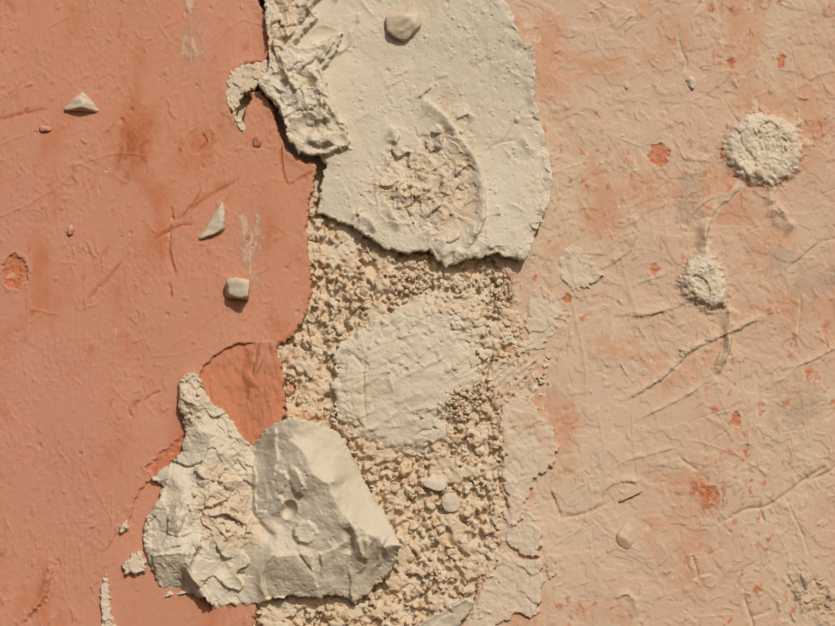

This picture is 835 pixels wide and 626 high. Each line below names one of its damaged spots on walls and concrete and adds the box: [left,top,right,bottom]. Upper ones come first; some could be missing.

spalling [2,253,28,288]
flaking render [83,0,603,626]